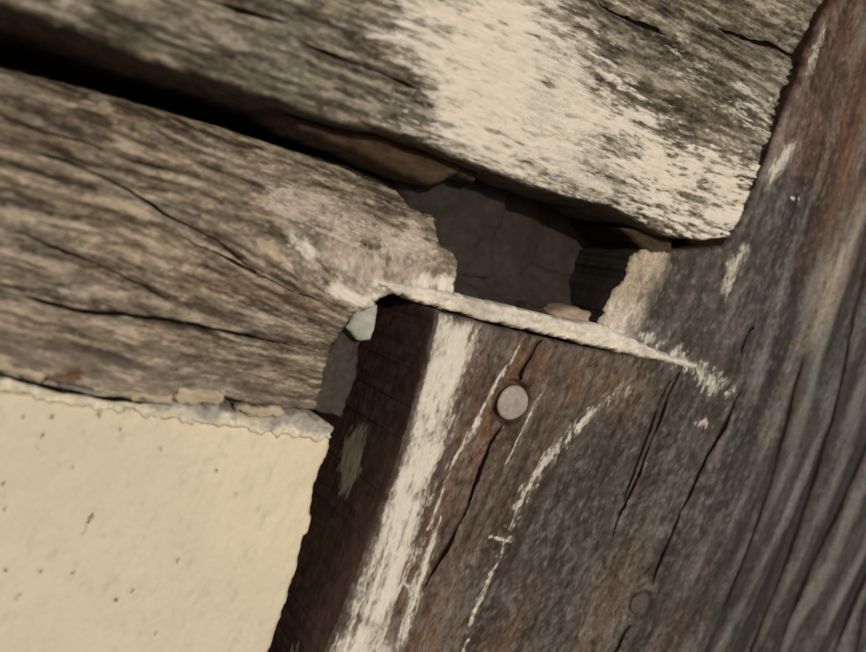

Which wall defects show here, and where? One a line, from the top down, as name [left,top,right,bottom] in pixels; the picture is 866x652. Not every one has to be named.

crack [0,114,322,301]
peeling [0,355,47,383]
peeling [88,379,286,418]
crack [425,425,503,587]
crack [520,340,542,381]
crack [613,373,680,536]
crack [652,389,743,585]
crack [614,625,631,652]